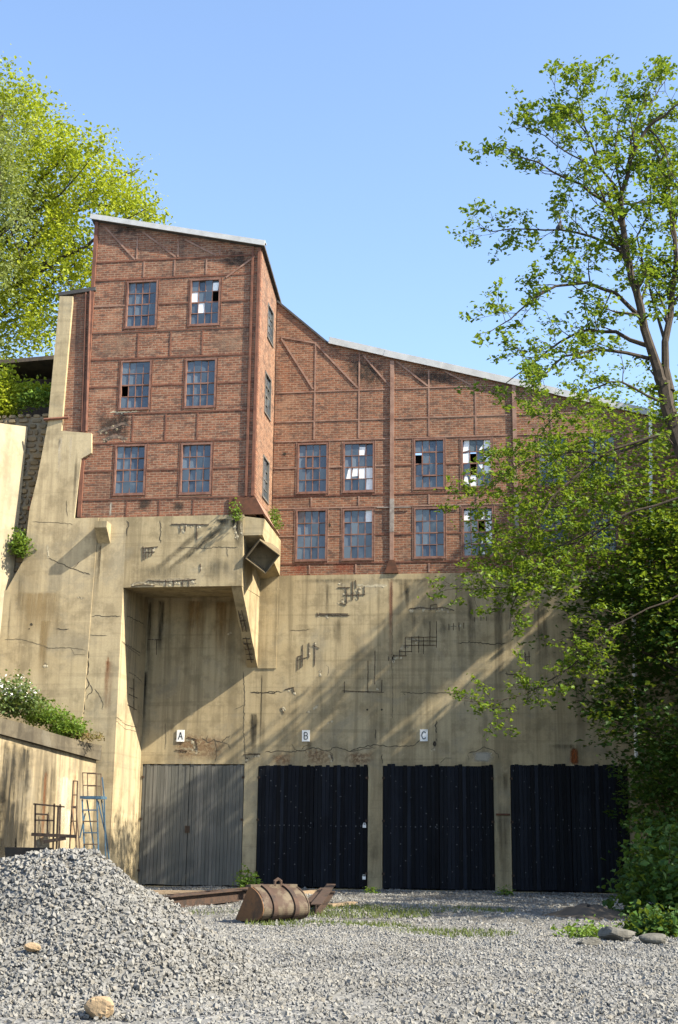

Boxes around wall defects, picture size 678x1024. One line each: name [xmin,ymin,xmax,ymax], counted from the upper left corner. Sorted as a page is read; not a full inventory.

crack [4,615,143,732]
crack [202,661,465,763]